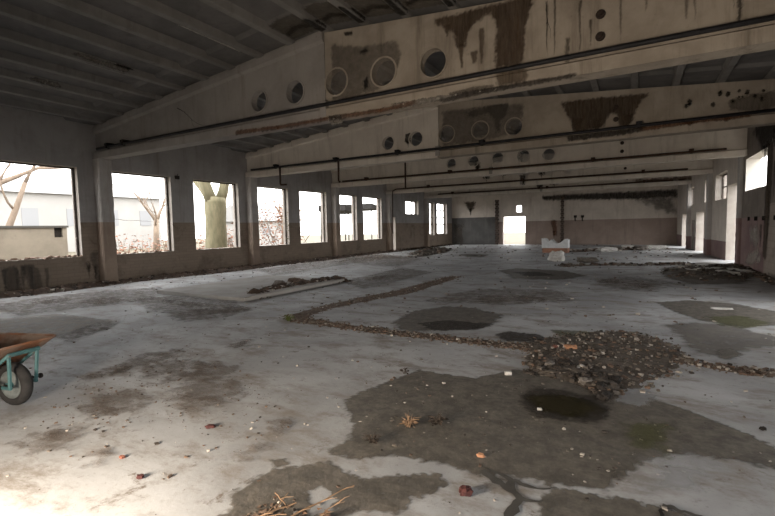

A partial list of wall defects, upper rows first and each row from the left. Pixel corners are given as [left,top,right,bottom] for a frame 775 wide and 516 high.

water stain [270,0,576,102]
water stain [443,104,522,145]